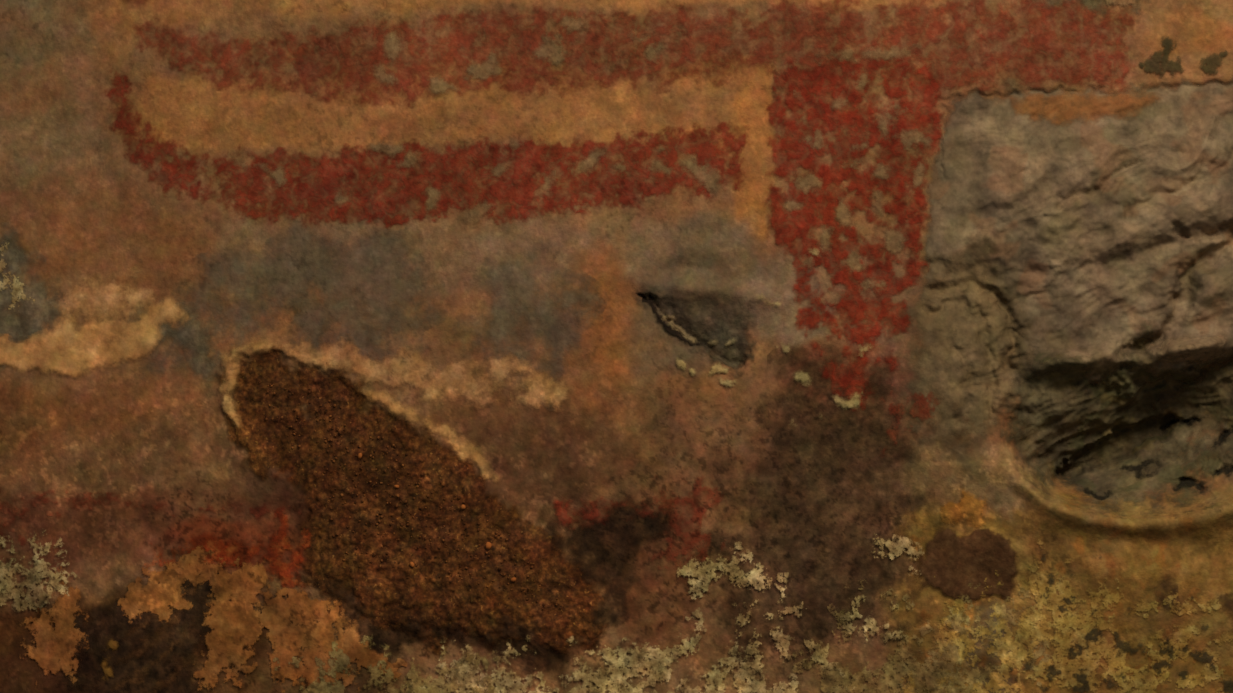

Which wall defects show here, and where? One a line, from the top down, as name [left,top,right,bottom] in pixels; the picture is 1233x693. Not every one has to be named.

peeling [1012,94,1154,124]
peeling [1146,331,1227,363]
spalling [1121,460,1159,478]
spalling [1174,463,1233,490]
peeling [941,491,986,528]